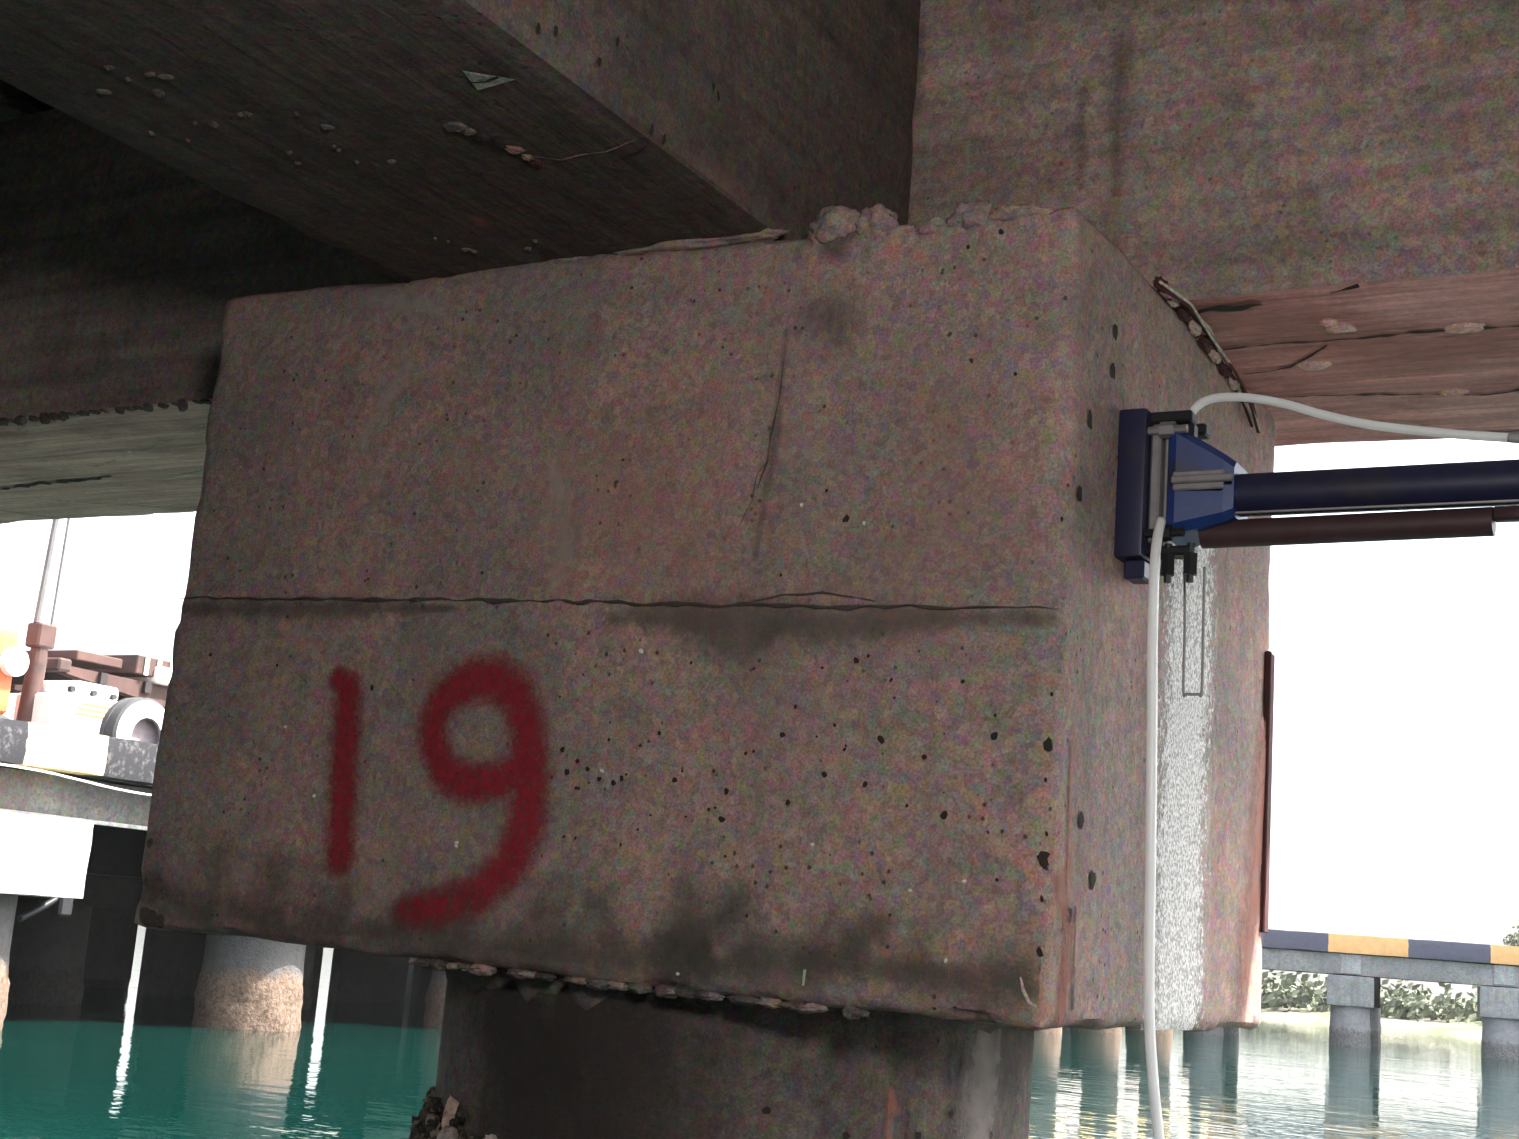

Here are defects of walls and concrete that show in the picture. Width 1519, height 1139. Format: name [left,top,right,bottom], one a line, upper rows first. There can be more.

crack [0,79,55,114]
crack [740,361,784,525]
crack [179,591,1059,610]